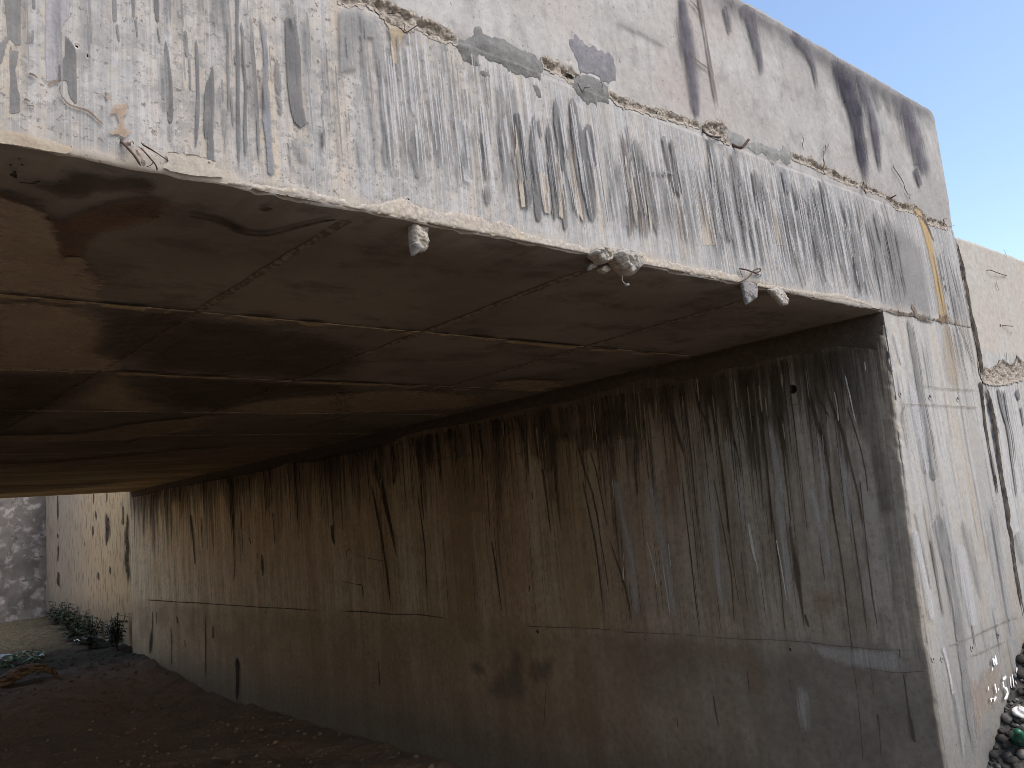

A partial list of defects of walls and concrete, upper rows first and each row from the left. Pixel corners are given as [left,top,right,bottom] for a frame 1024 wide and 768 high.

water stain [35,176,154,199]
spalling [163,153,612,274]
water stain [154,0,929,313]
water stain [0,193,1024,758]
crack [888,216,1024,655]
spalling [978,355,1024,386]